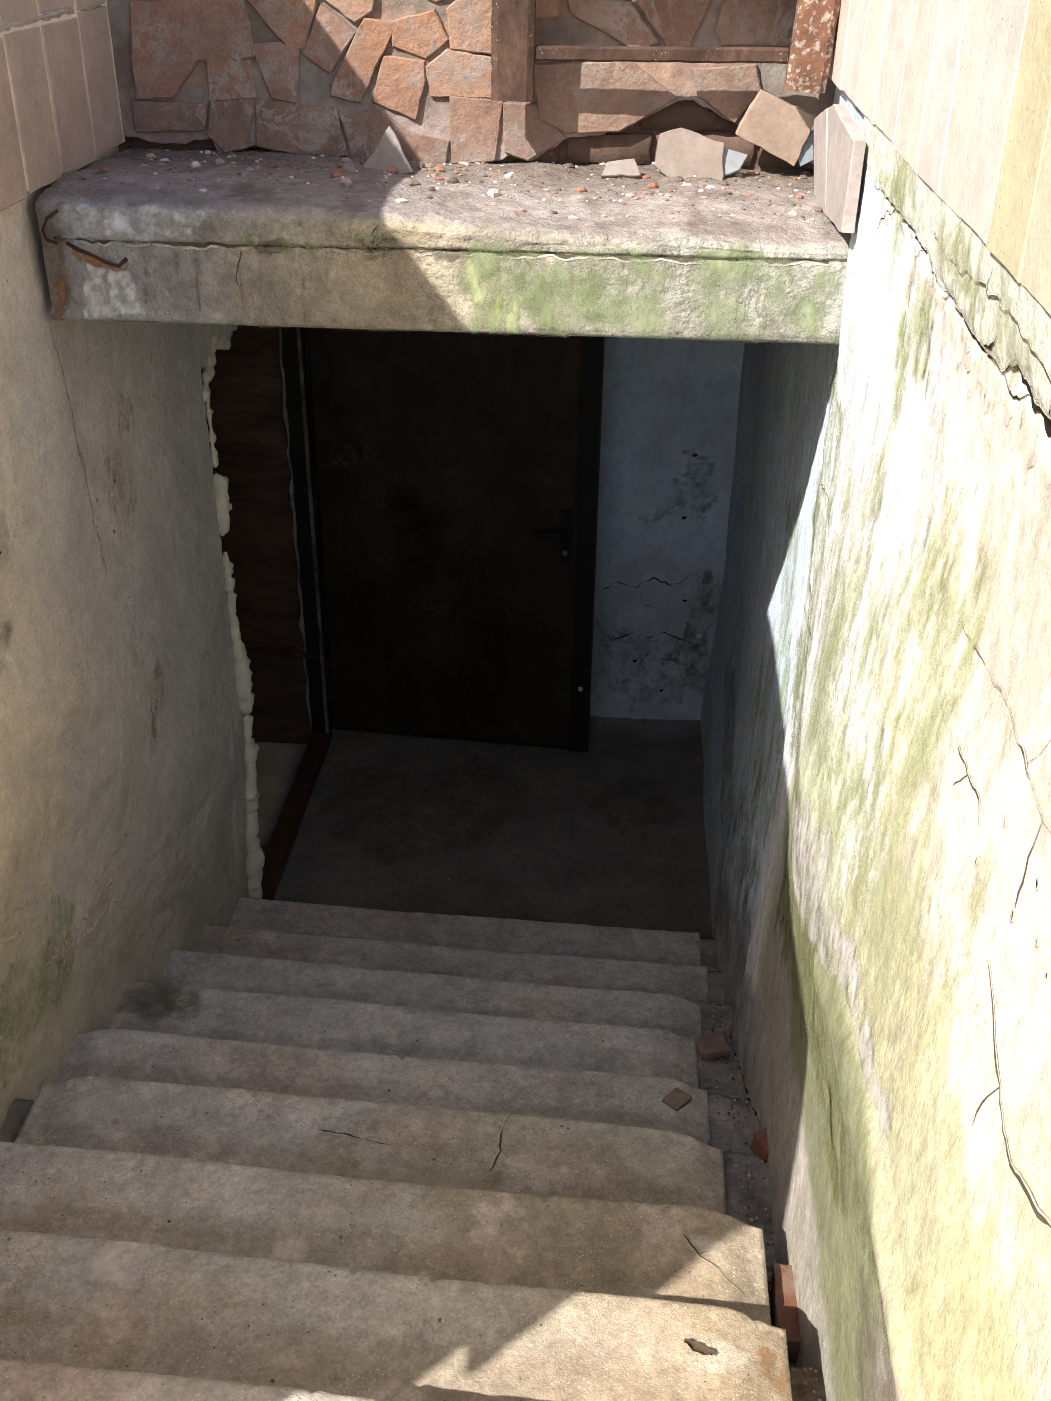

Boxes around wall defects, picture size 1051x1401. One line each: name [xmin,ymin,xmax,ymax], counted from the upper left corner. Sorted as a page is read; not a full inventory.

crack [871,174,1051,437]
crack [598,574,704,651]
crack [952,743,980,825]
crack [958,617,1051,906]
crack [972,961,1051,1228]